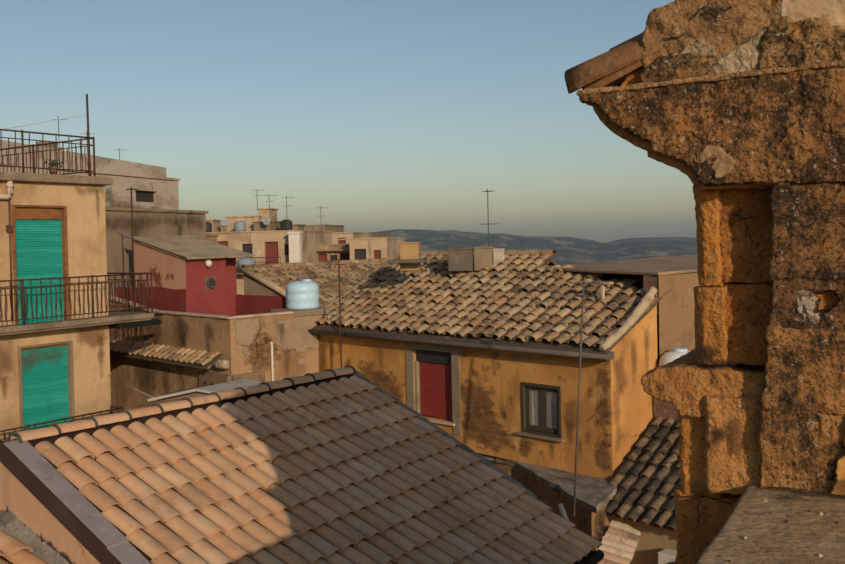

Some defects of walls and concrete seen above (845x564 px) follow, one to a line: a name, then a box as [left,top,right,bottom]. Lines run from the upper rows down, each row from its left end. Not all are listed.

crack [660,3,734,41]
spalling [796,290,839,325]